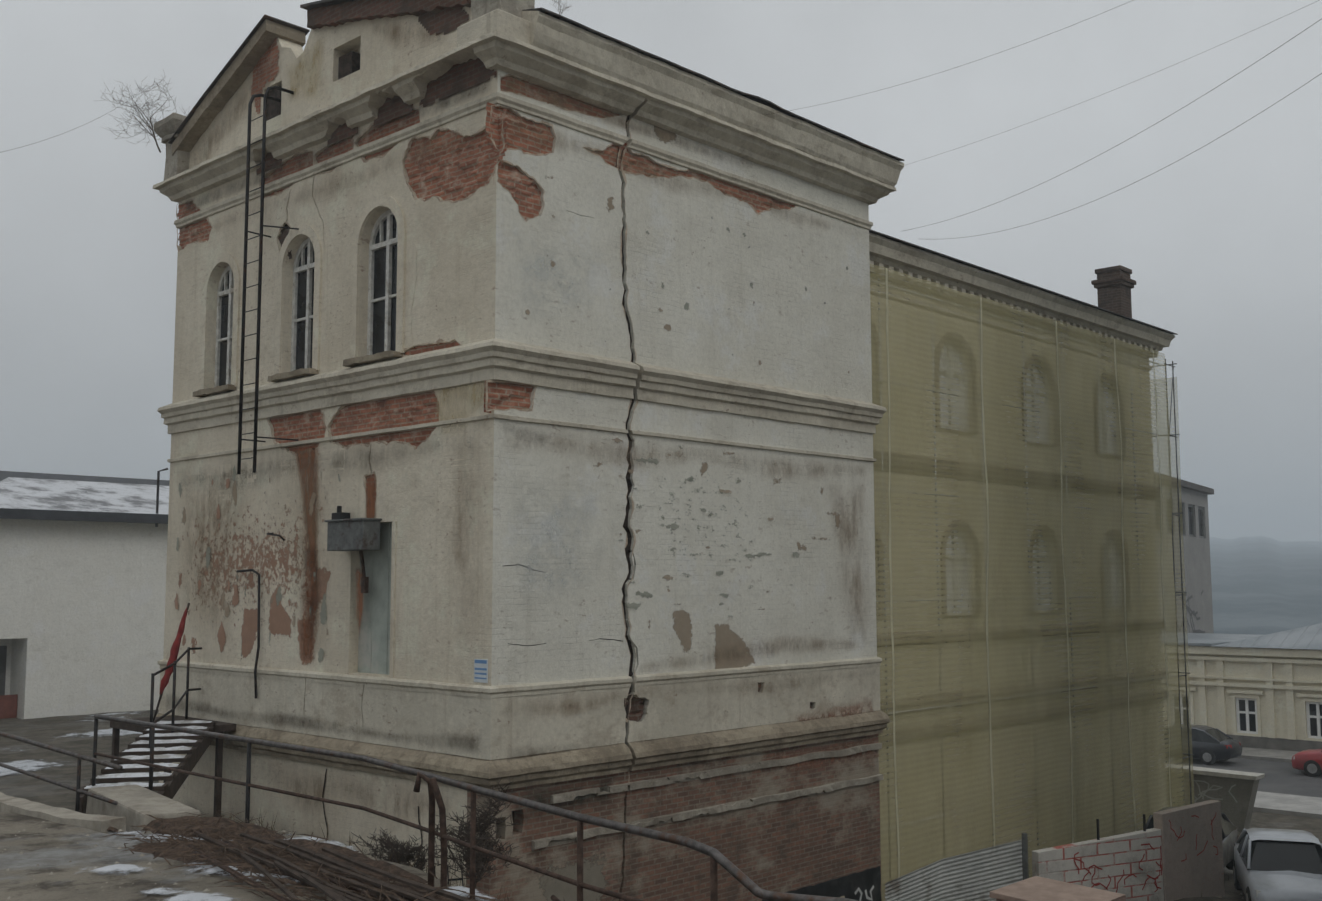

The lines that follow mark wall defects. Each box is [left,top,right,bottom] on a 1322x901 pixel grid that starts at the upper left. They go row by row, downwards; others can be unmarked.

flaking render [259,74,622,223]
flaking render [582,142,798,215]
crack [616,115,637,363]
flaking render [267,391,440,455]
flaking render [484,380,537,413]
peeling [659,462,772,575]
peeling [174,466,338,666]
crack [595,399,638,718]
peeling [626,573,689,620]
peeling [673,604,693,653]
peeling [715,593,754,669]
flaking render [624,694,644,723]